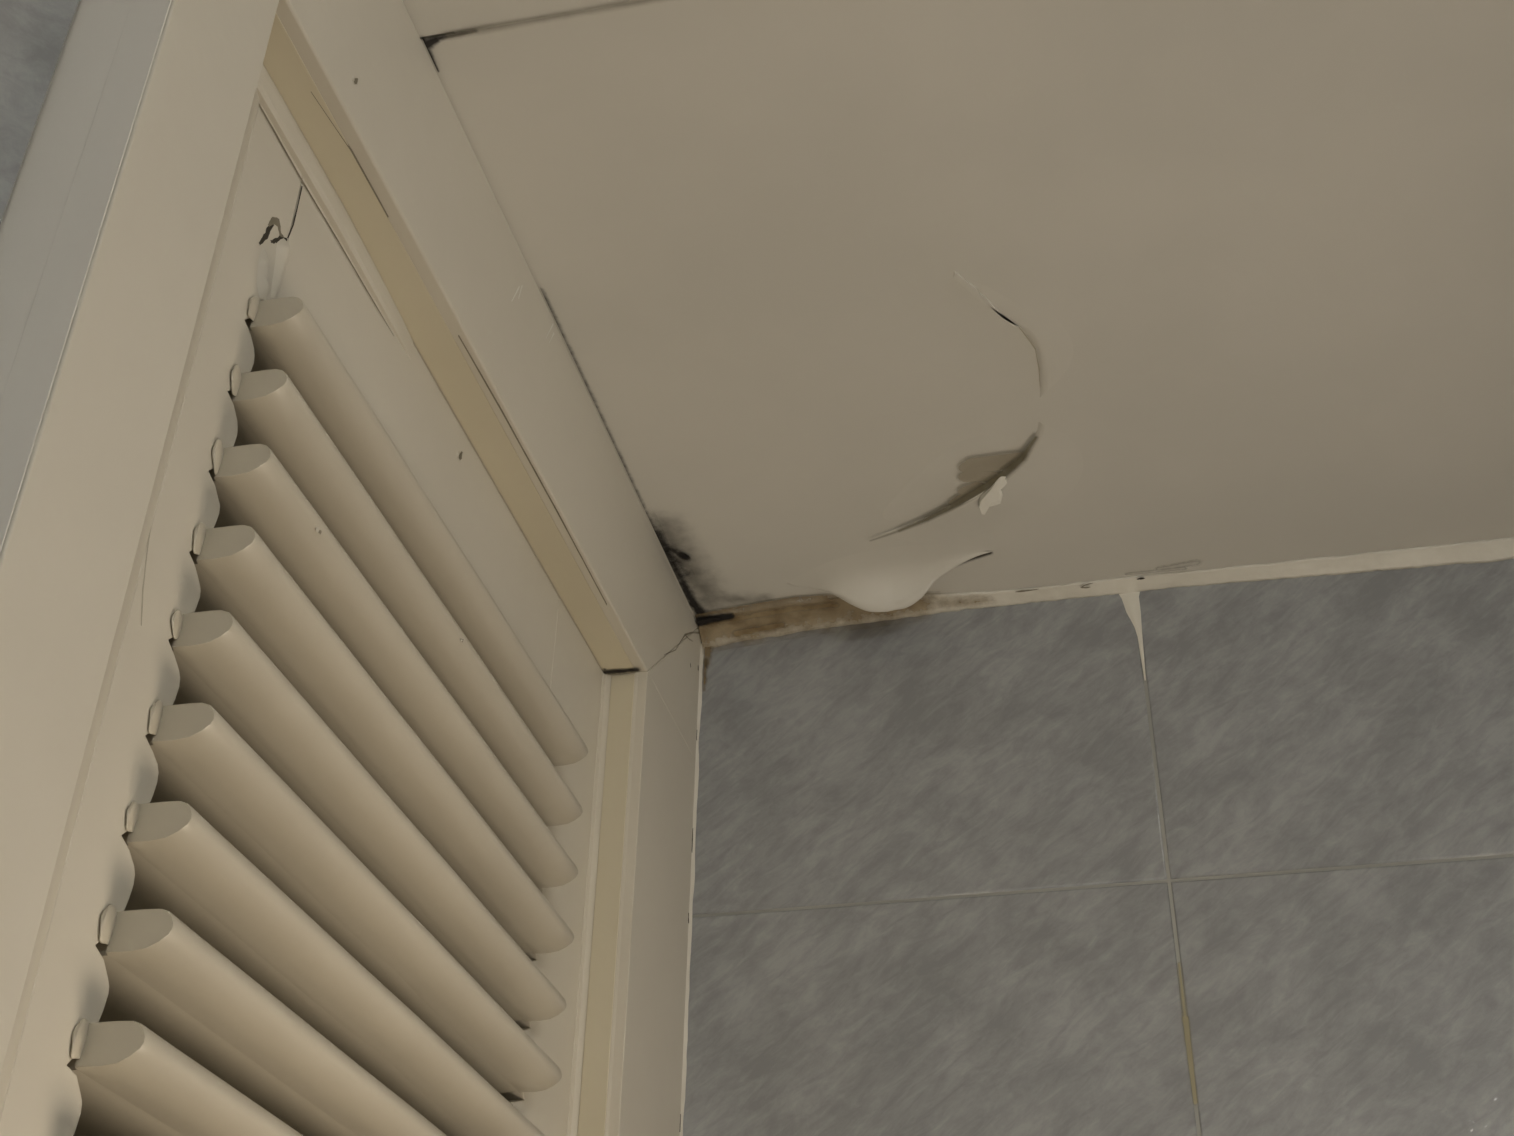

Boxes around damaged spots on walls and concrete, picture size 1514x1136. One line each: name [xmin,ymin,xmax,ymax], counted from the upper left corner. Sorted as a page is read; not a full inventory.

peeling [954,272,1073,398]
leakage [543,295,721,625]
peeling [871,422,1083,543]